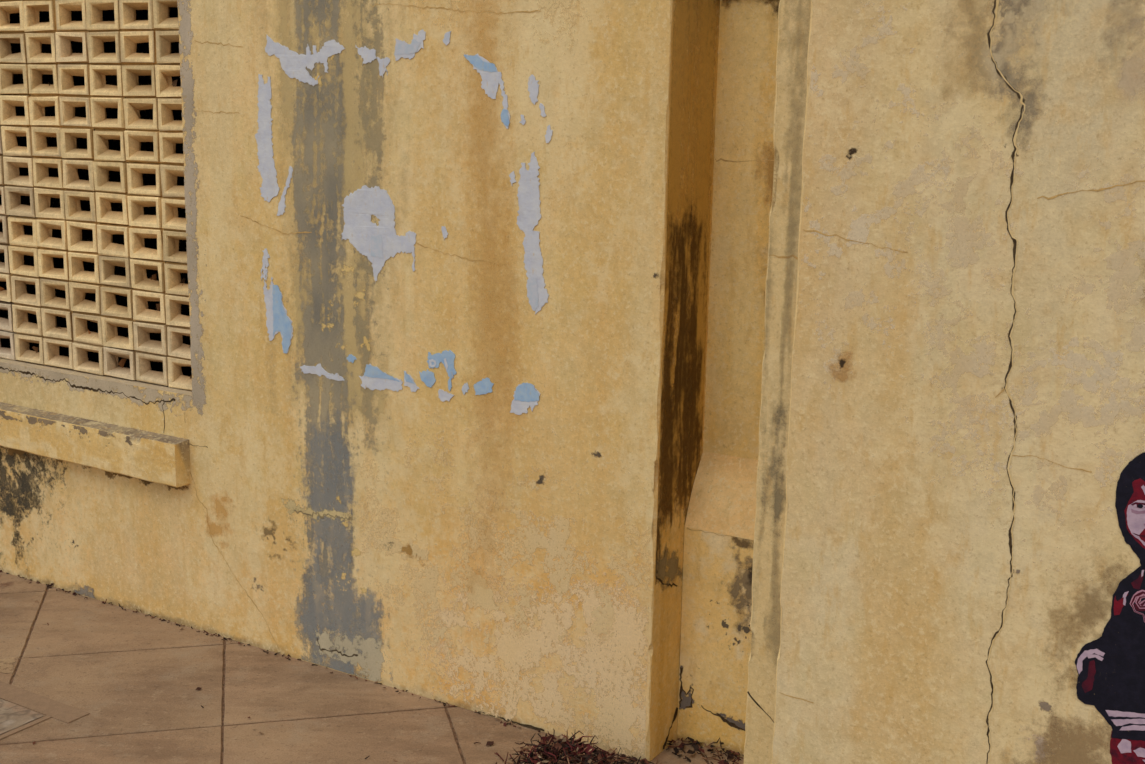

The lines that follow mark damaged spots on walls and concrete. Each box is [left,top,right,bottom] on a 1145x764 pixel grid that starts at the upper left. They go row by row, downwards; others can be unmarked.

water stain [0,446,67,564]
water stain [291,0,706,757]
water stain [708,536,753,646]
crack [986,0,1145,764]